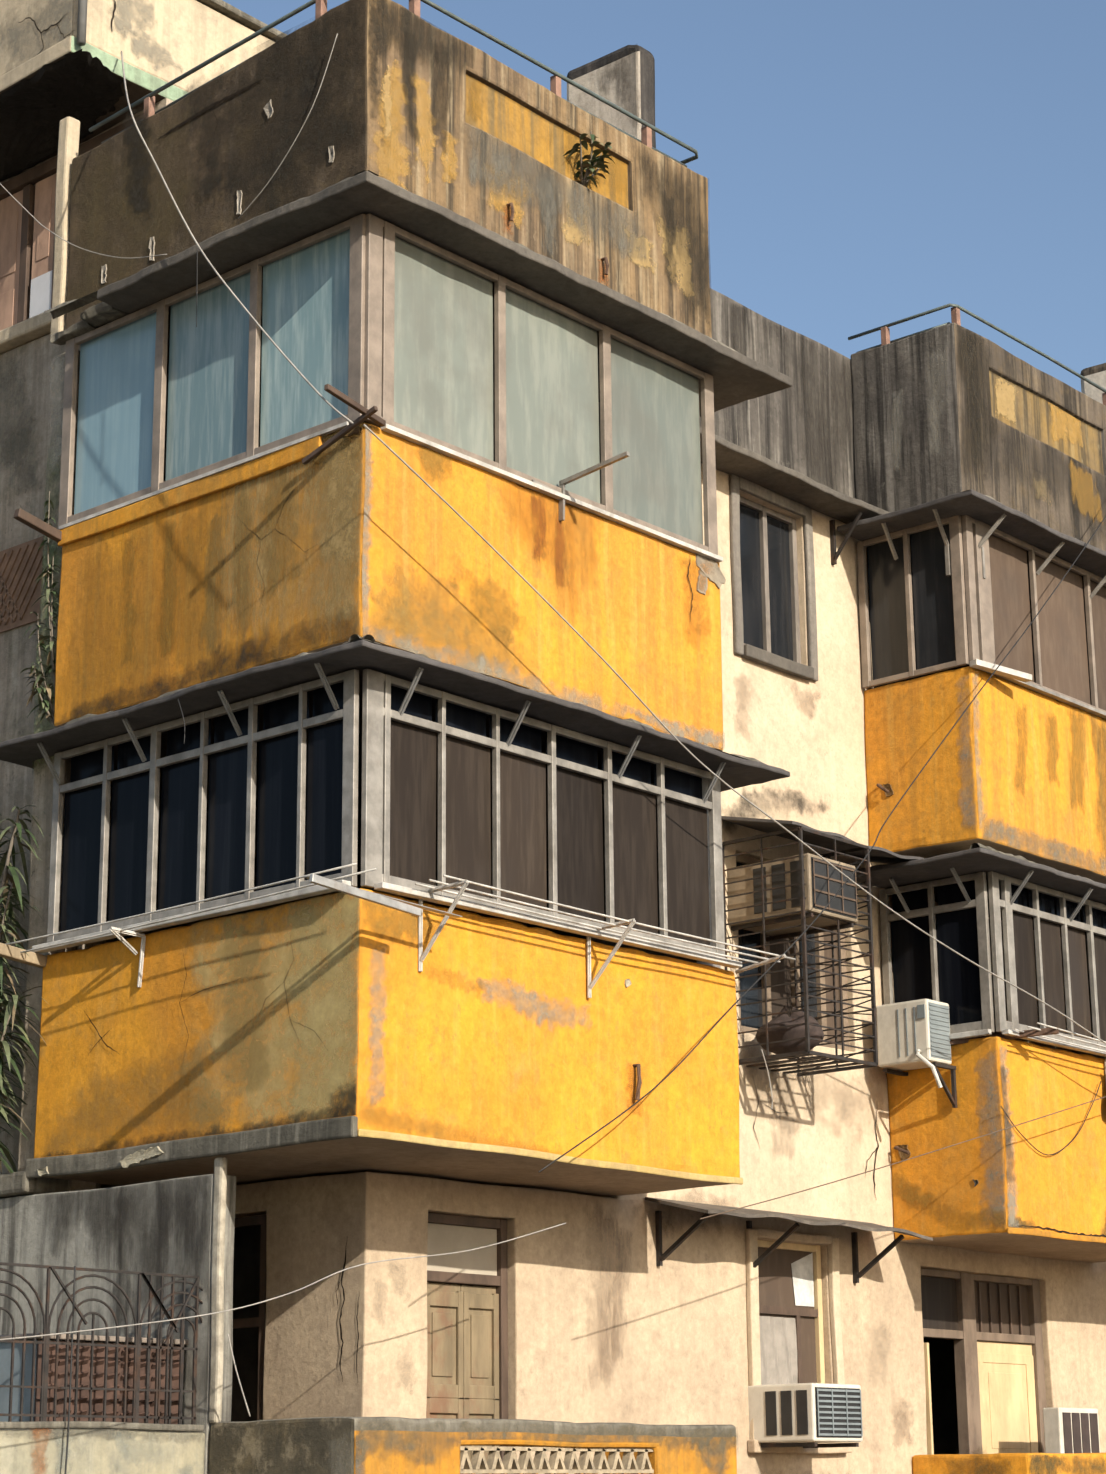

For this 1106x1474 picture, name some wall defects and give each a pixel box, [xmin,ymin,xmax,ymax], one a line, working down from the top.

crack [19,14,73,55]
damp [469,87,634,254]
damp [643,157,711,311]
peeling [995,378,1016,422]
peeling [1051,404,1102,522]
crack [179,938,326,1060]
crack [336,1242,359,1379]